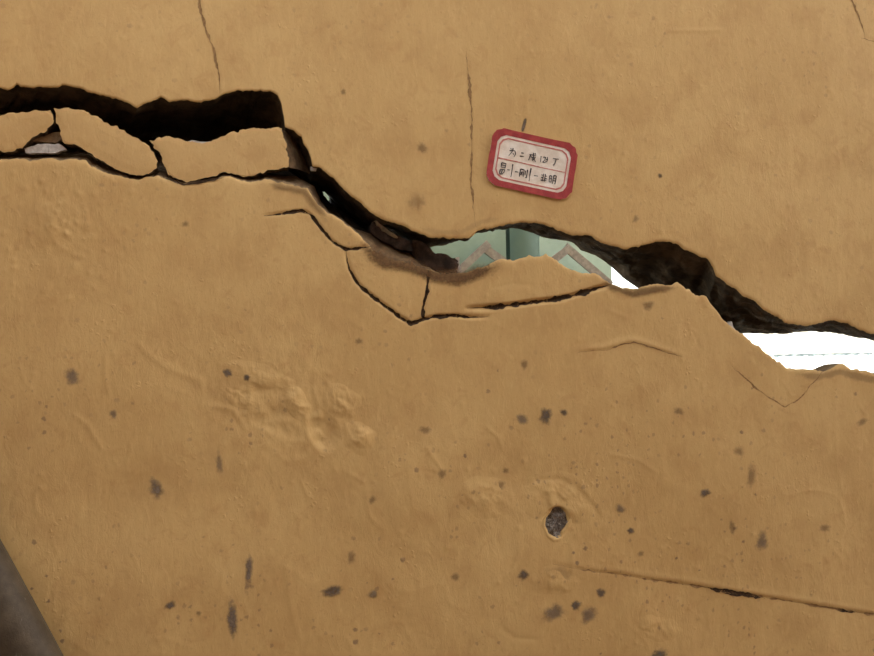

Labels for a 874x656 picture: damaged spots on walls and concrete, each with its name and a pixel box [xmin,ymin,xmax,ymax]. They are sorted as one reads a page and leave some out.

crack [0,0,874,341]
crack [732,363,874,407]
spalling [542,507,572,542]
crack [552,563,874,616]